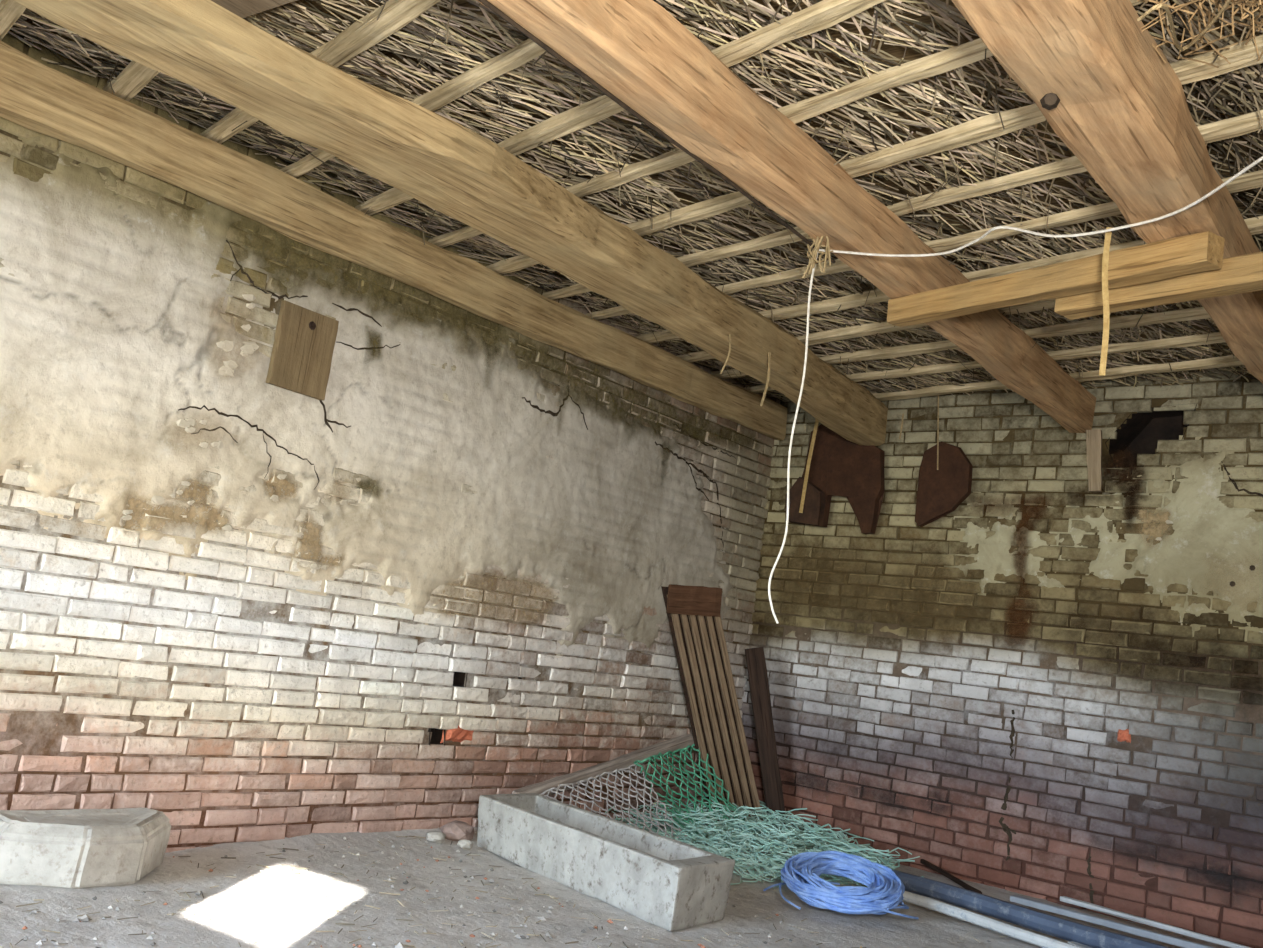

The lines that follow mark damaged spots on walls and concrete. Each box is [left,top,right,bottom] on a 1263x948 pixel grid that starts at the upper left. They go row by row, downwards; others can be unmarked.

peeling [242,294,256,309]
peeling [216,324,259,377]
crack [319,400,351,433]
crack [178,405,320,489]
spalling [121,481,233,532]
spalling [266,473,297,502]
spalling [324,478,379,505]
spalling [295,516,342,570]